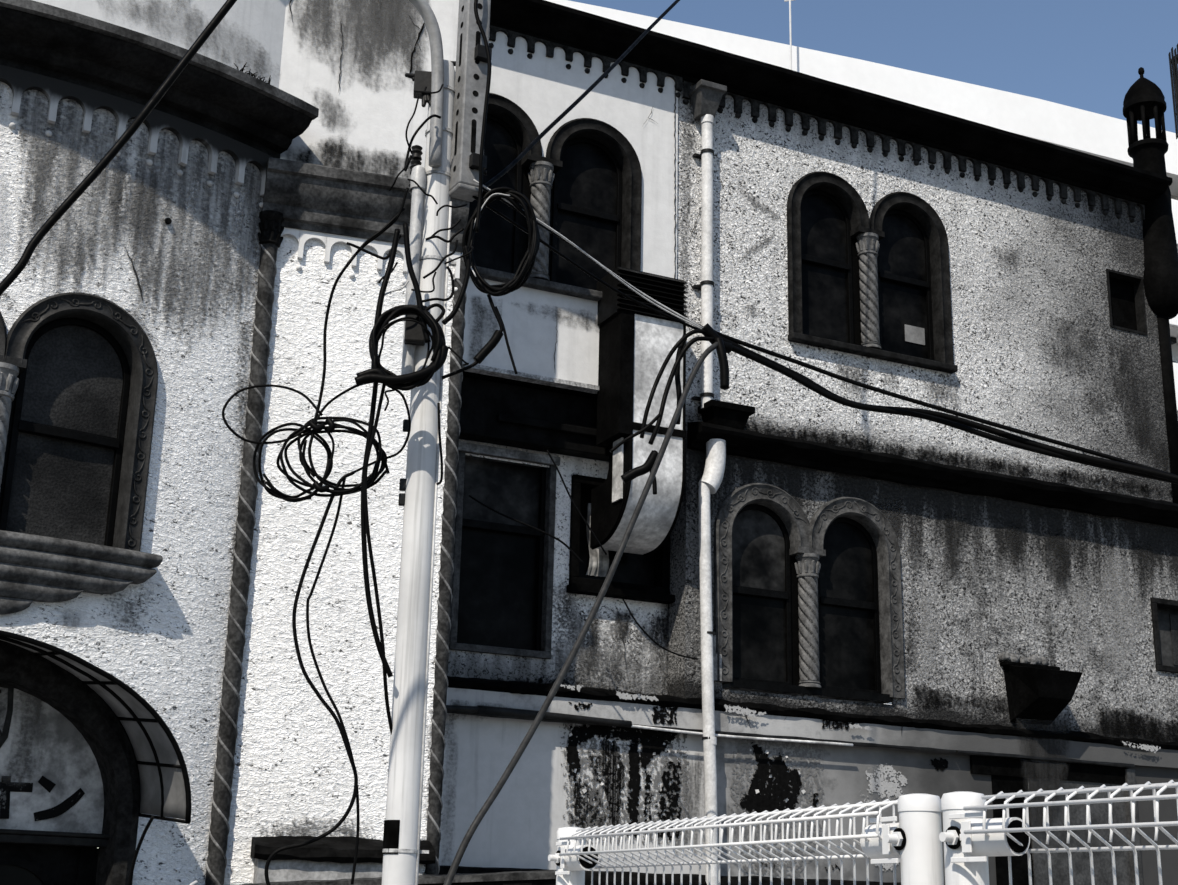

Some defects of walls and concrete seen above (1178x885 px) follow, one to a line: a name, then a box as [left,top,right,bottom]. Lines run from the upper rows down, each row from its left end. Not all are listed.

damp [295,0,426,86]
damp [288,95,412,178]
damp [0,90,262,473]
damp [945,514,975,576]
damp [1044,530,1071,586]
peeling [560,684,689,846]
spalling [724,705,767,718]
peeling [822,719,872,730]
damp [906,598,1068,827]
damp [1094,707,1178,742]
spalling [1122,741,1161,753]
peeling [728,738,824,879]